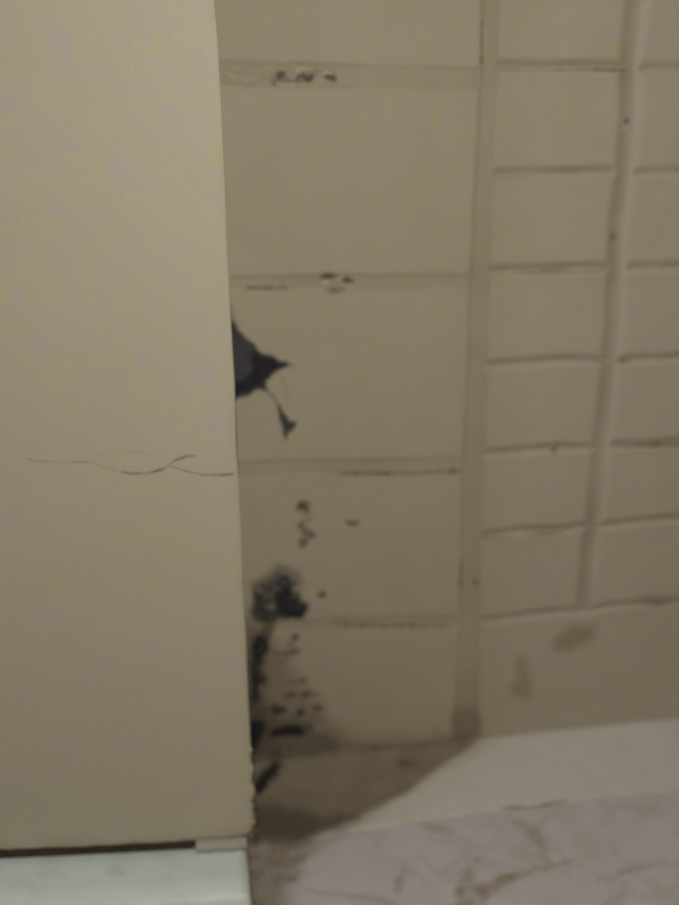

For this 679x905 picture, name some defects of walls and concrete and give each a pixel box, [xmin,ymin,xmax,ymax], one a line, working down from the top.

damp [251,575,308,701]
damp [250,721,262,751]
damp [276,707,321,736]
damp [254,762,279,792]